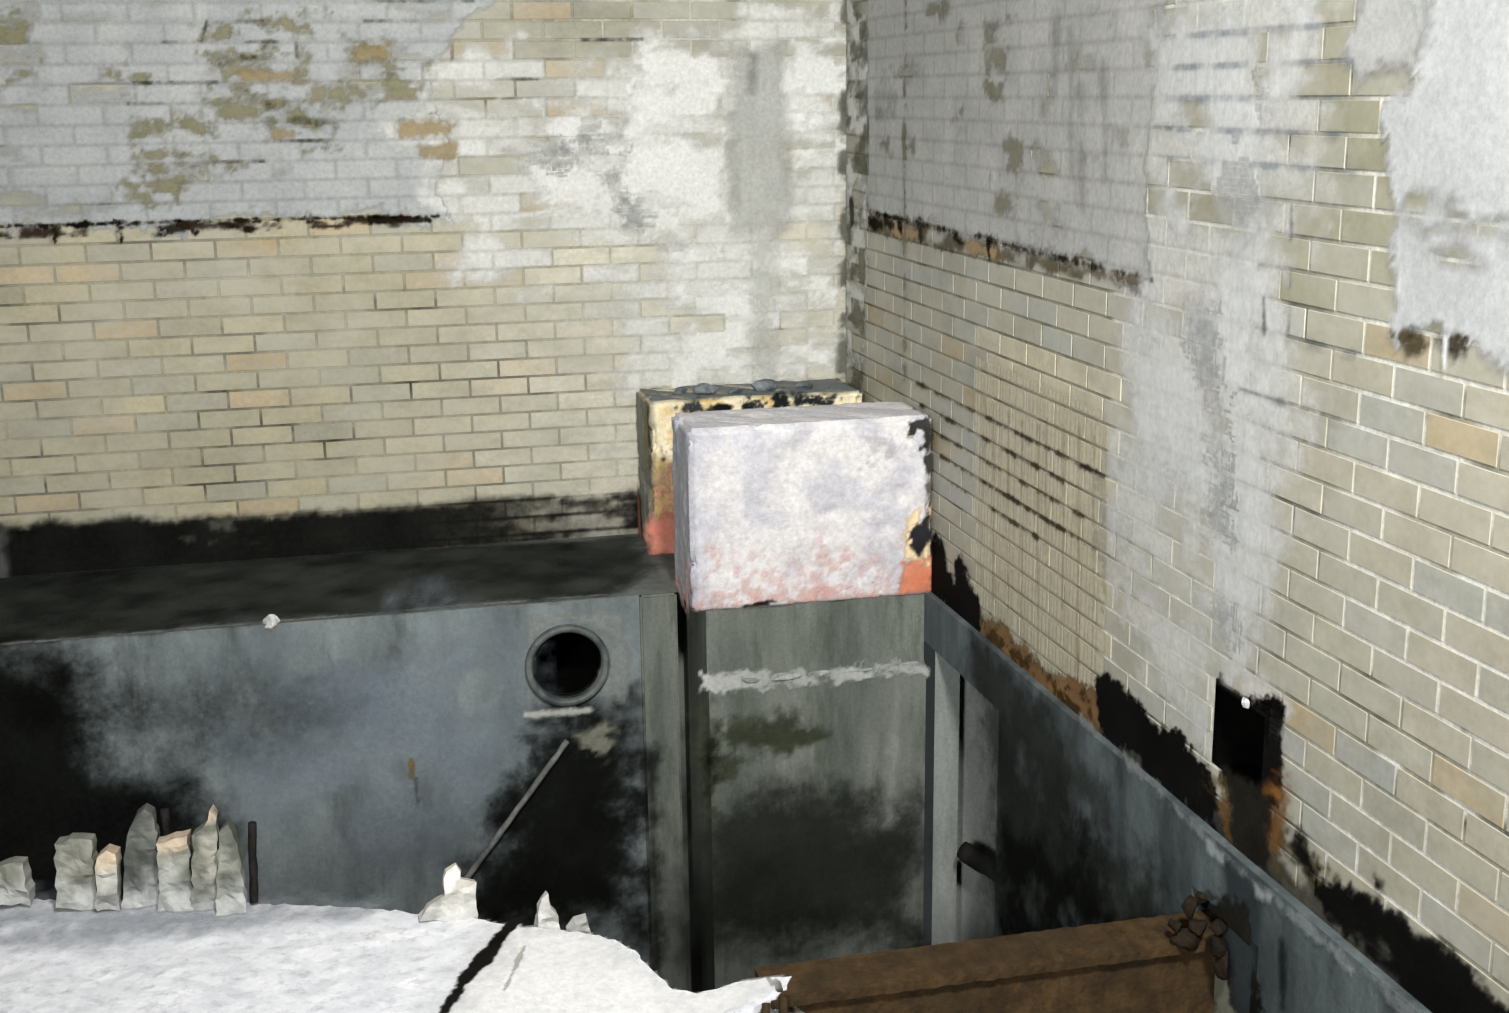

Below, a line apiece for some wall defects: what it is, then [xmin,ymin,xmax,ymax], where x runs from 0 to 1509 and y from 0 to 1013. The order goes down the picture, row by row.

peeling [0,0,494,243]
damp [379,0,847,396]
damp [1110,0,1317,717]
damp [0,492,661,971]
spalling [744,582,838,607]
damp [682,700,929,956]
spalling [899,416,1432,1013]
corrosion [1266,785,1286,852]
crack [439,918,525,1013]